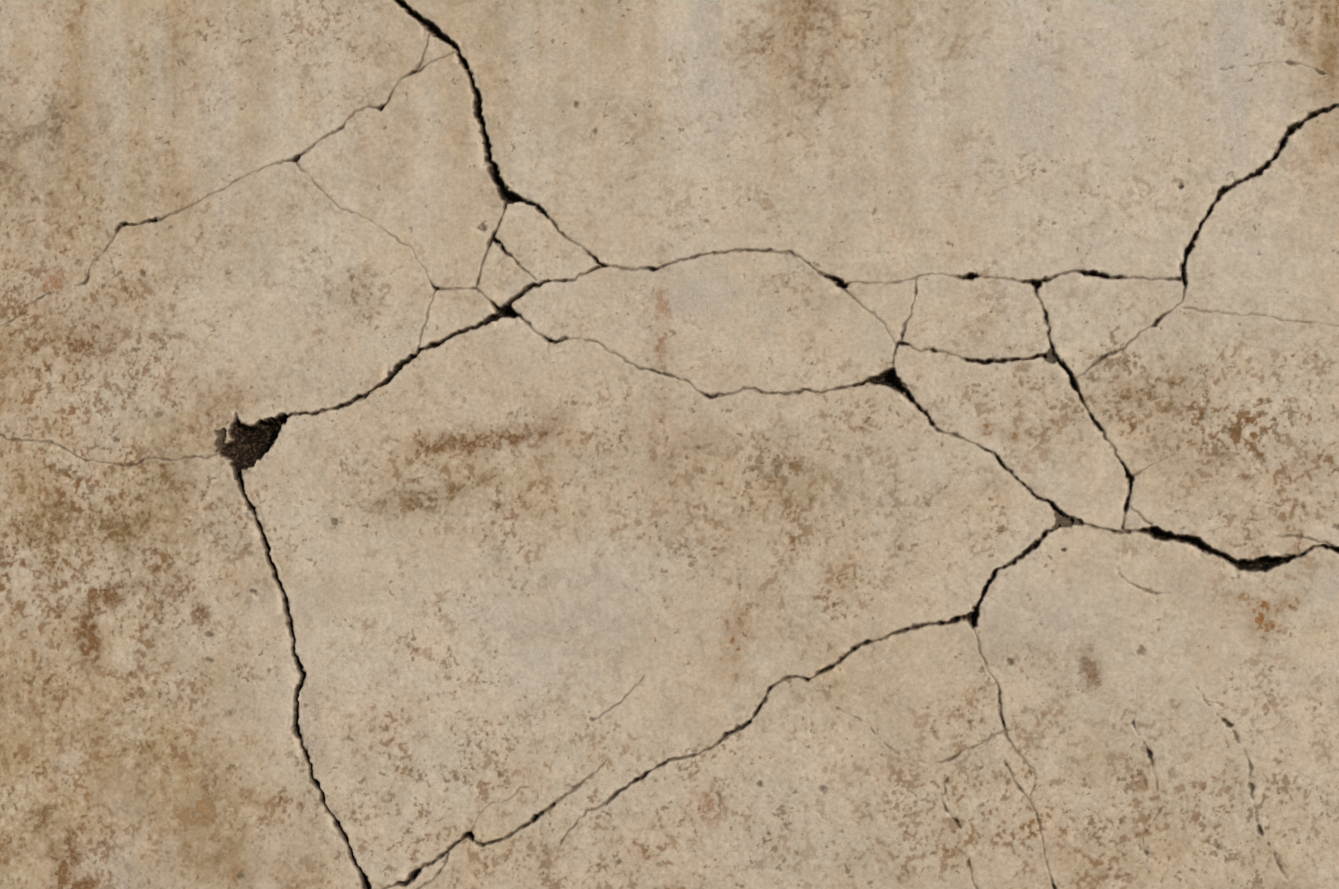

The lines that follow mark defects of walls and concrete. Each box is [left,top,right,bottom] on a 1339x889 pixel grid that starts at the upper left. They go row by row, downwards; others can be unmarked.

crack [1219,64,1235,72]
crack [1283,60,1330,76]
crack [74,0,606,419]
crack [0,291,51,327]
crack [0,433,218,468]
crack [558,102,1339,889]
crack [236,473,607,889]